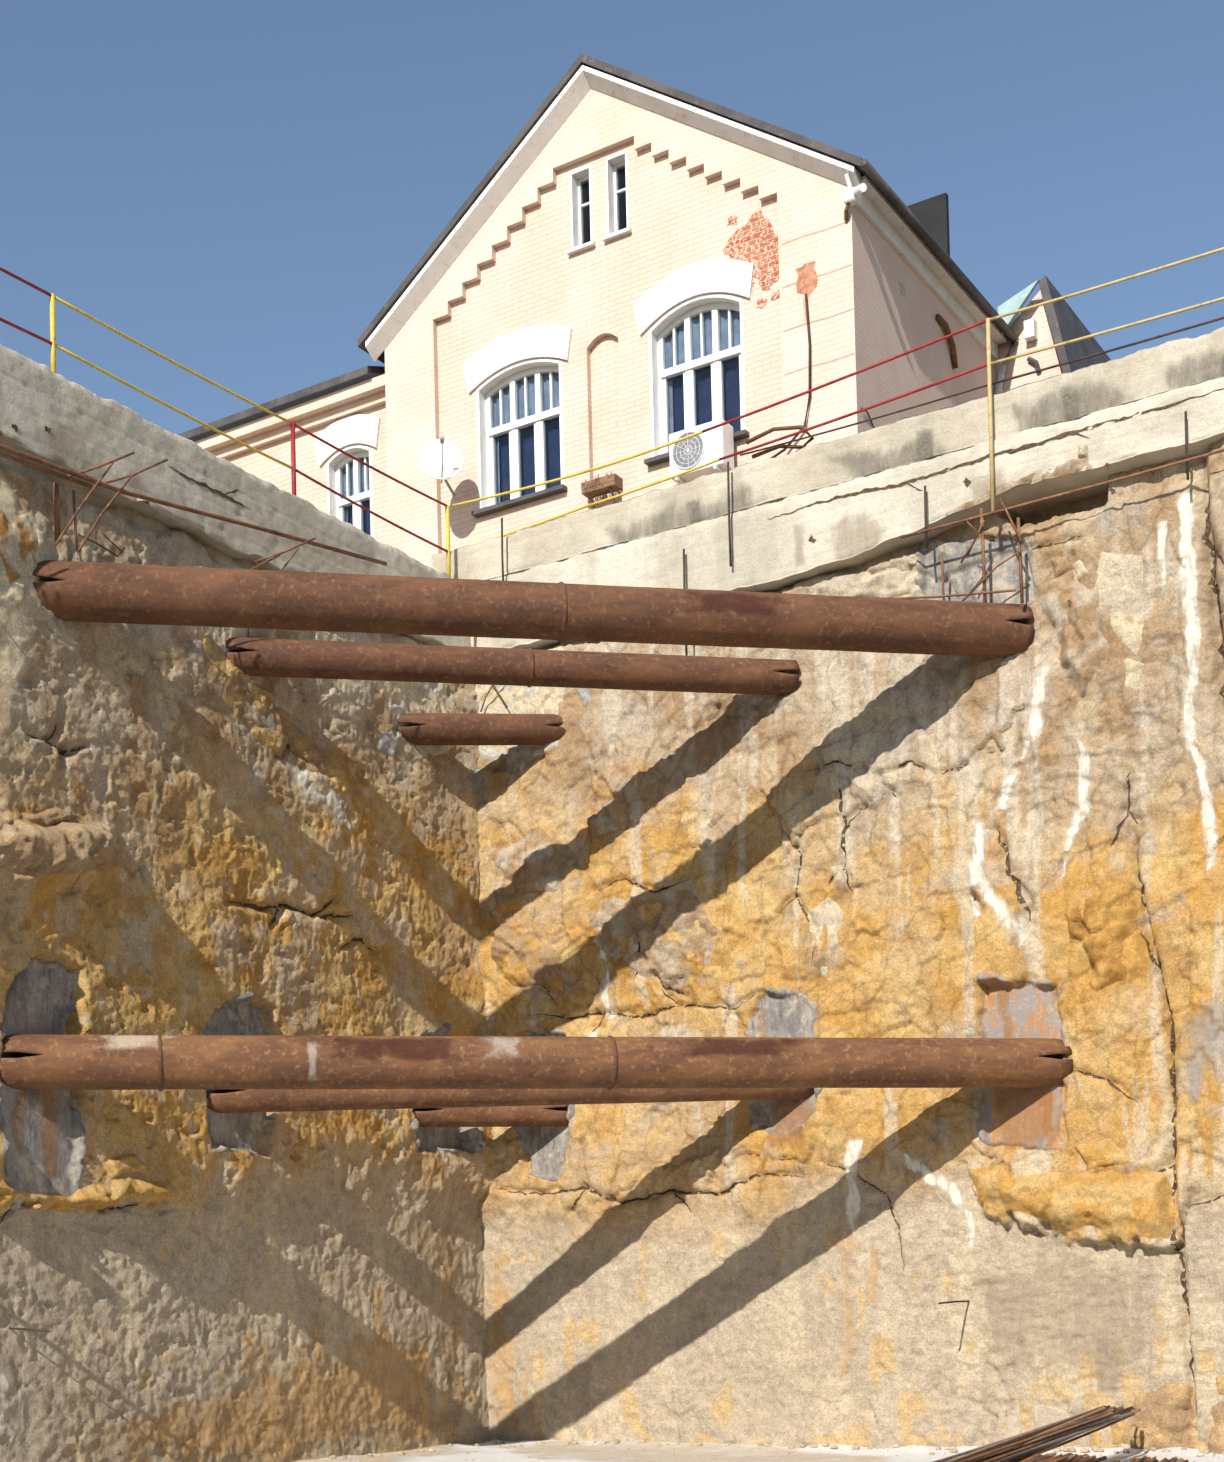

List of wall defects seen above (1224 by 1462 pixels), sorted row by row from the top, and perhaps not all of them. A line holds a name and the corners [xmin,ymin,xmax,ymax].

peeling [722,210,780,308]
water stain [1157,492,1218,870]
crack [1072,1070,1138,1102]
crack [1110,772,1224,1414]